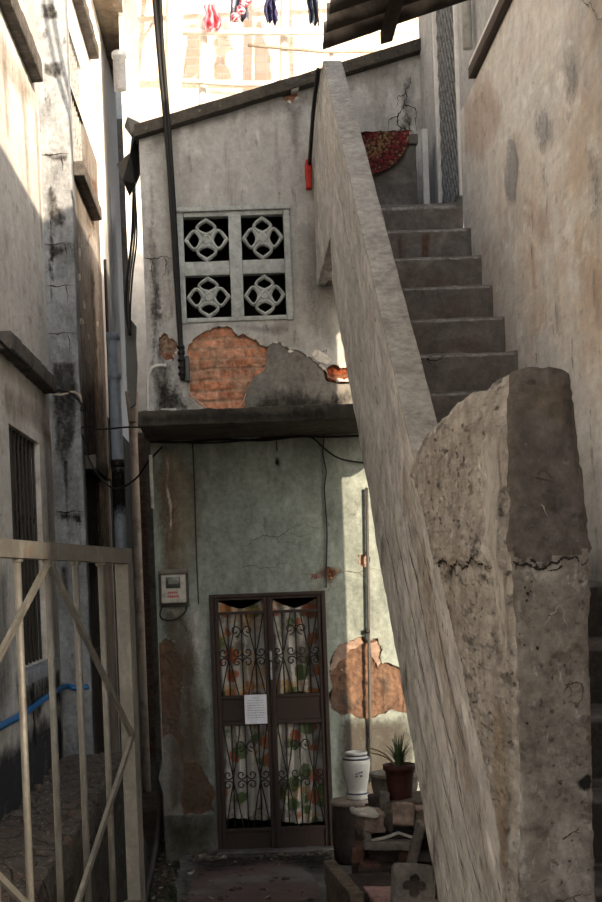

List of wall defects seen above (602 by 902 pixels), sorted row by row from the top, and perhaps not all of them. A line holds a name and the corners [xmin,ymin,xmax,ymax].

crack [388,79,417,134]
leakage [53,271,107,498]
spalling [159,325,353,409]
leakage [60,470,110,547]
spalling [157,637,217,816]
spalling [329,636,407,719]
crack [342,481,588,902]